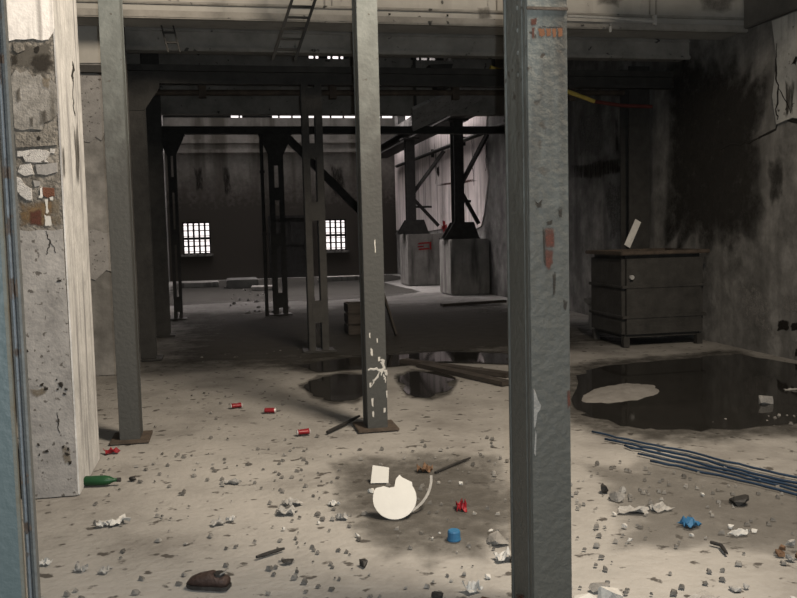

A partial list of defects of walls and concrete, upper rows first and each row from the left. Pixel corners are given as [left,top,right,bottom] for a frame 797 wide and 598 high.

spalling [11,43,54,73]
damp [786,83,794,115]
peeling [17,136,58,201]